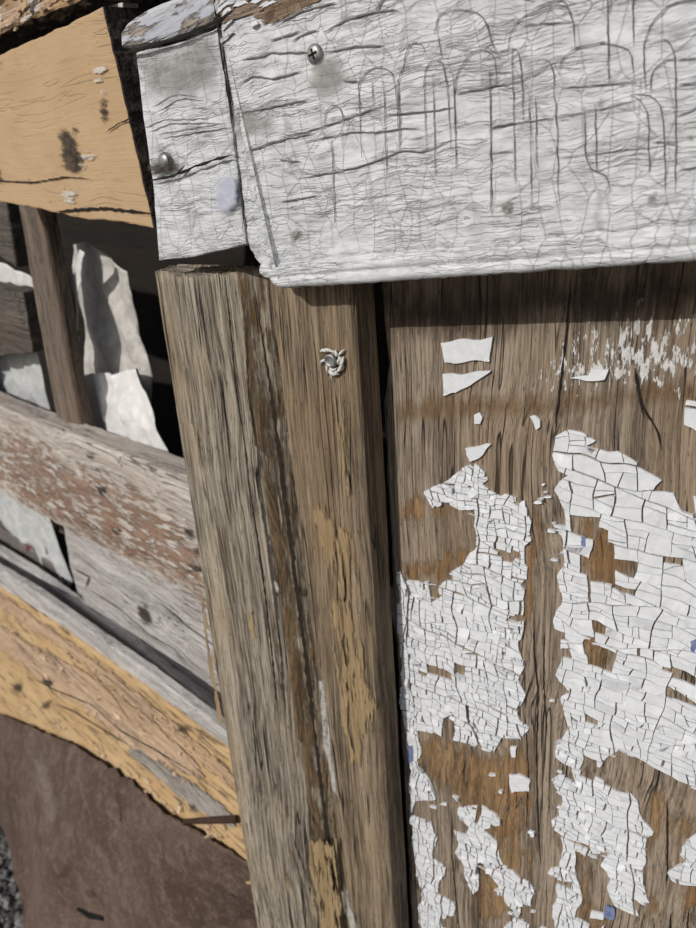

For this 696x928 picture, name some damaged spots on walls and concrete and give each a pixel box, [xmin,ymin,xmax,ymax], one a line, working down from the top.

peeling [216,0,319,43]
crack [107,0,696,223]
crack [0,175,88,183]
crack [56,206,150,214]
peeling [404,336,516,424]
peeling [527,399,542,430]
crack [555,277,571,429]
peeling [571,368,609,381]
crack [634,368,662,450]
peeling [671,388,696,430]
peeling [397,429,696,928]
rust [0,714,258,928]